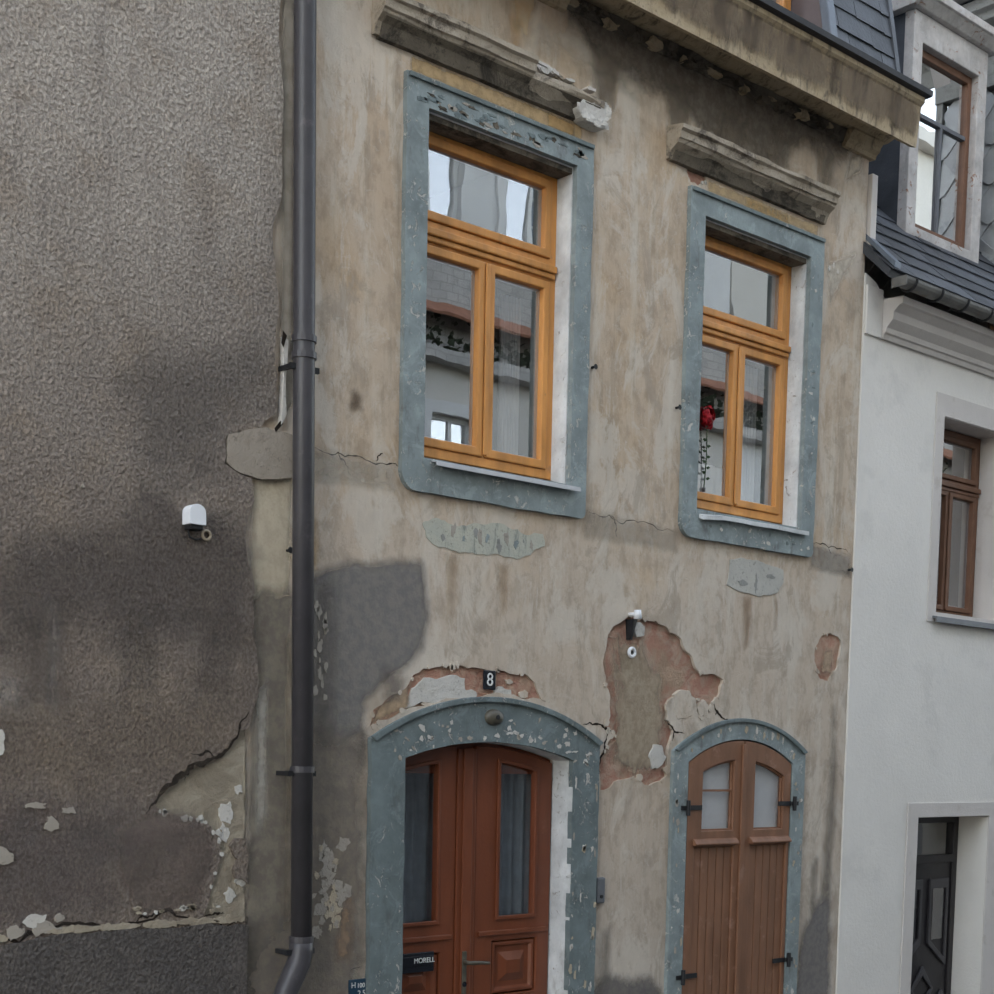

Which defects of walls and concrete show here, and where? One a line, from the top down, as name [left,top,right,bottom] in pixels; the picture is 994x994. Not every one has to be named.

peeling [412,57,612,160]
spalling [561,0,848,143]
crack [318,449,397,475]
peeling [422,518,545,559]
crack [593,513,673,536]
crack [146,712,249,814]
flaking render [370,661,540,730]
flaking render [441,616,726,832]
flaking render [814,632,841,681]
flaking render [0,730,249,942]
crack [8,907,247,943]
peeling [312,837,352,939]